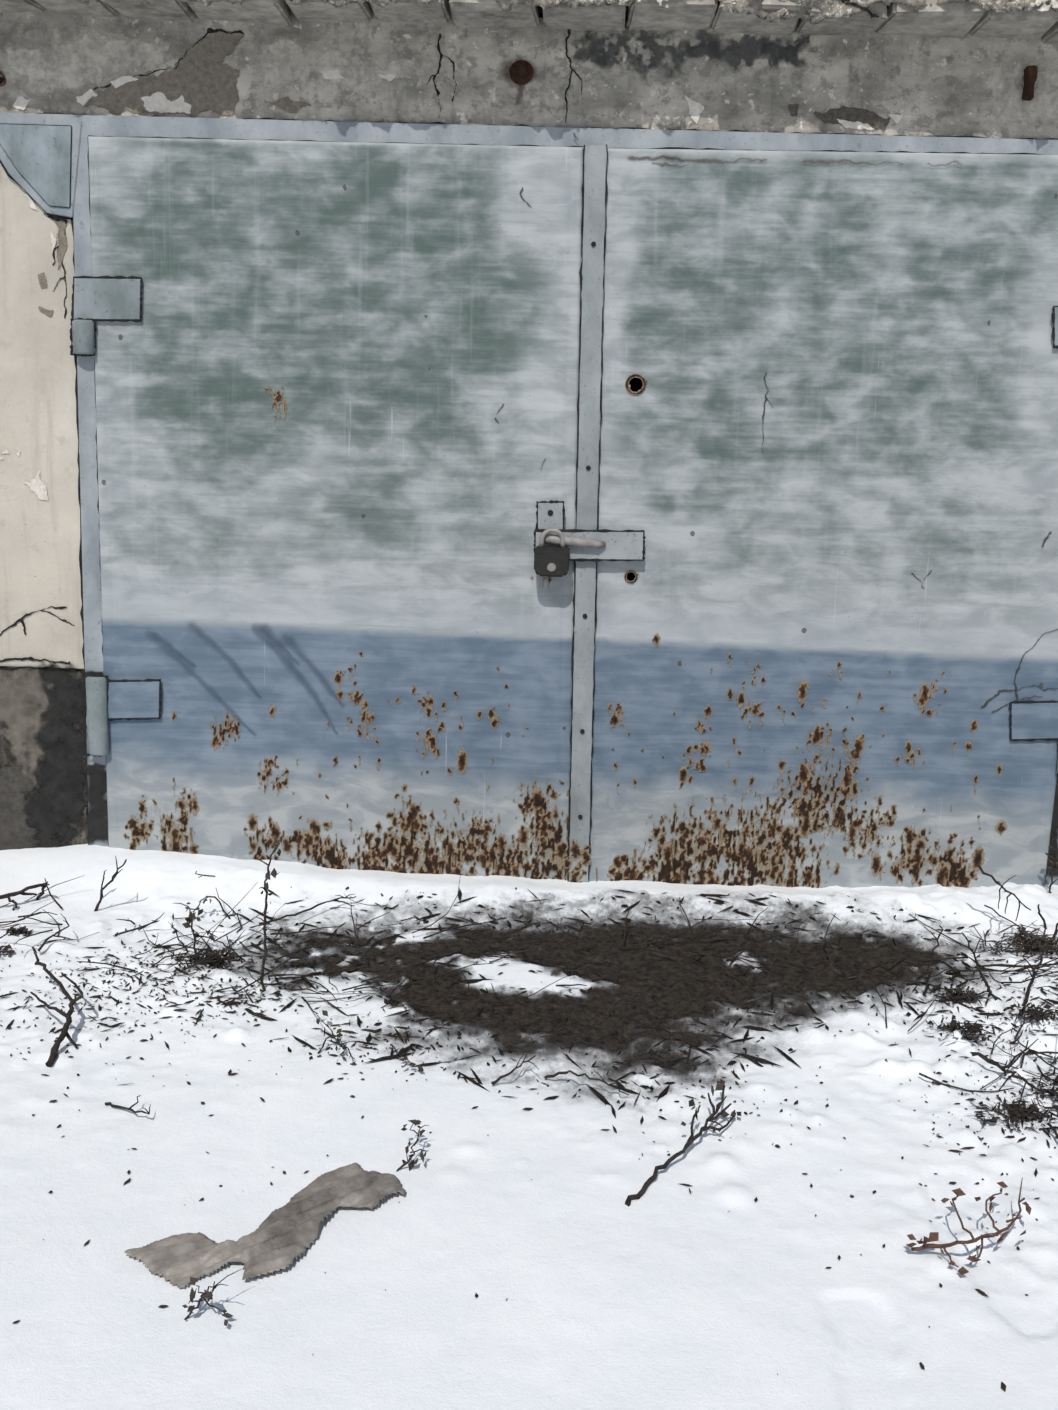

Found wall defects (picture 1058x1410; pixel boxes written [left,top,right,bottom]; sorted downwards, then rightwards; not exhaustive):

peeling [7,28,244,118]
peeling [258,38,432,114]
crack [426,33,457,117]
crack [565,29,582,123]
leakage [573,29,813,77]
leakage [0,670,48,783]
corrosion [209,710,240,751]
corrosion [243,650,1007,888]
corrosion [123,778,199,854]